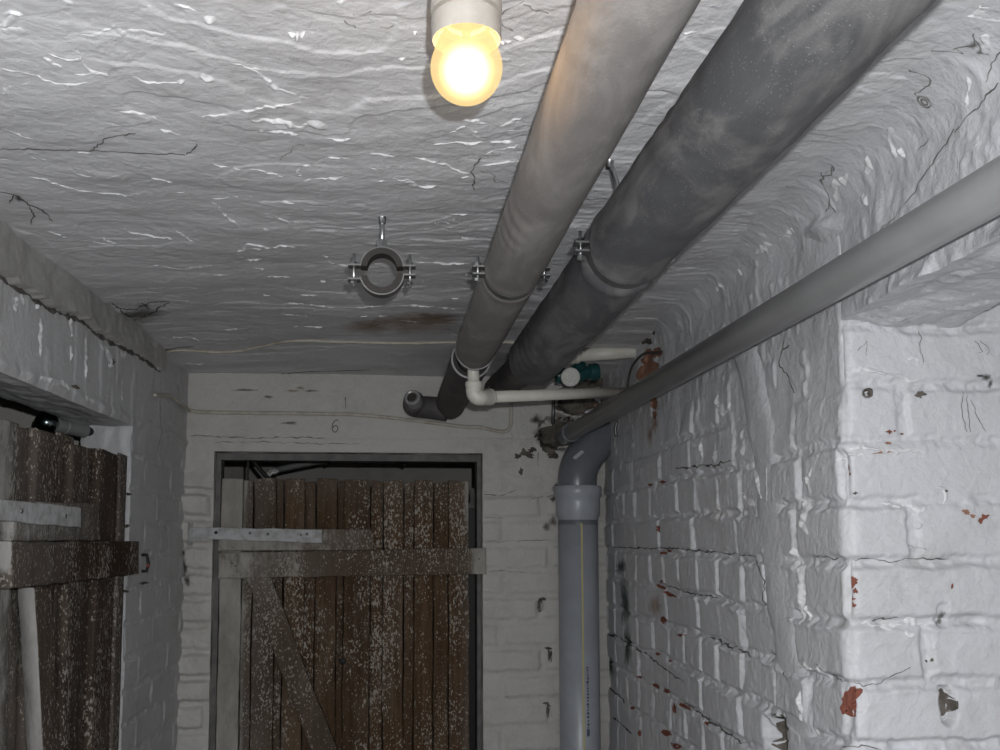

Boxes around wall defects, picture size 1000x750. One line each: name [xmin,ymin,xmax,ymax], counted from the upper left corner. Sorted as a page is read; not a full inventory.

crack [0,133,197,155]
crack [880,33,1000,230]
crack [1,192,52,225]
crack [788,161,836,213]
crack [0,275,189,450]
spalling [515,378,604,475]
crack [675,460,731,469]
leakage [621,583,629,619]
crack [614,546,767,605]
crack [608,631,746,744]
spalling [840,686,863,717]